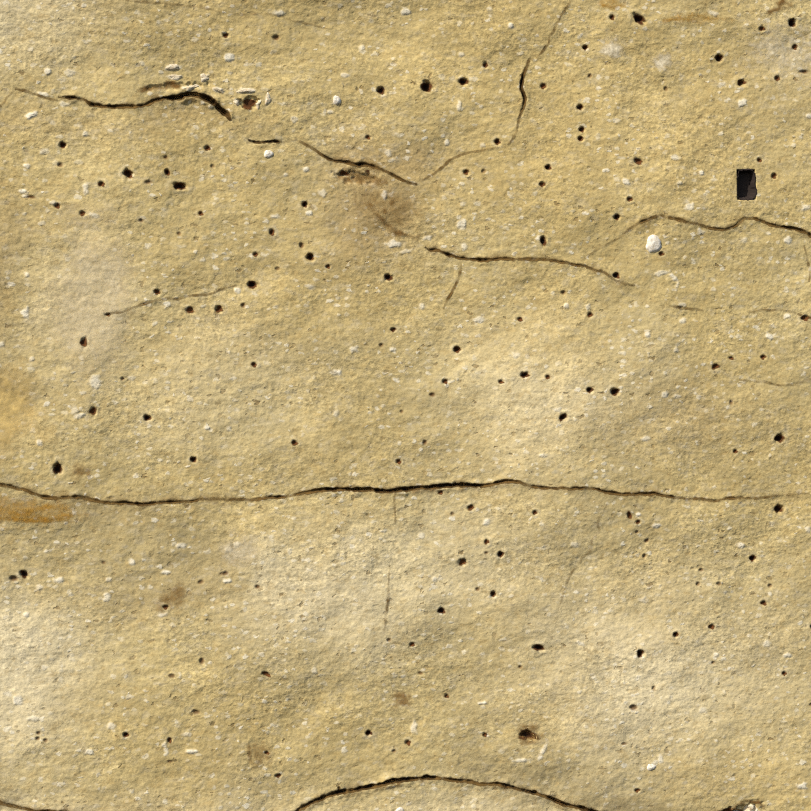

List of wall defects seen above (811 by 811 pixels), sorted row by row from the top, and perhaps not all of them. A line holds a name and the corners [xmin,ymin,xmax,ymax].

crack [510,8,567,142]
crack [15,88,231,121]
crack [248,137,282,145]
crack [303,142,417,185]
crack [434,153,464,173]
crack [628,215,811,238]
crack [424,247,608,300]
crack [0,483,206,506]
crack [228,479,769,502]
crack [295,775,598,811]
crack [0,801,66,811]